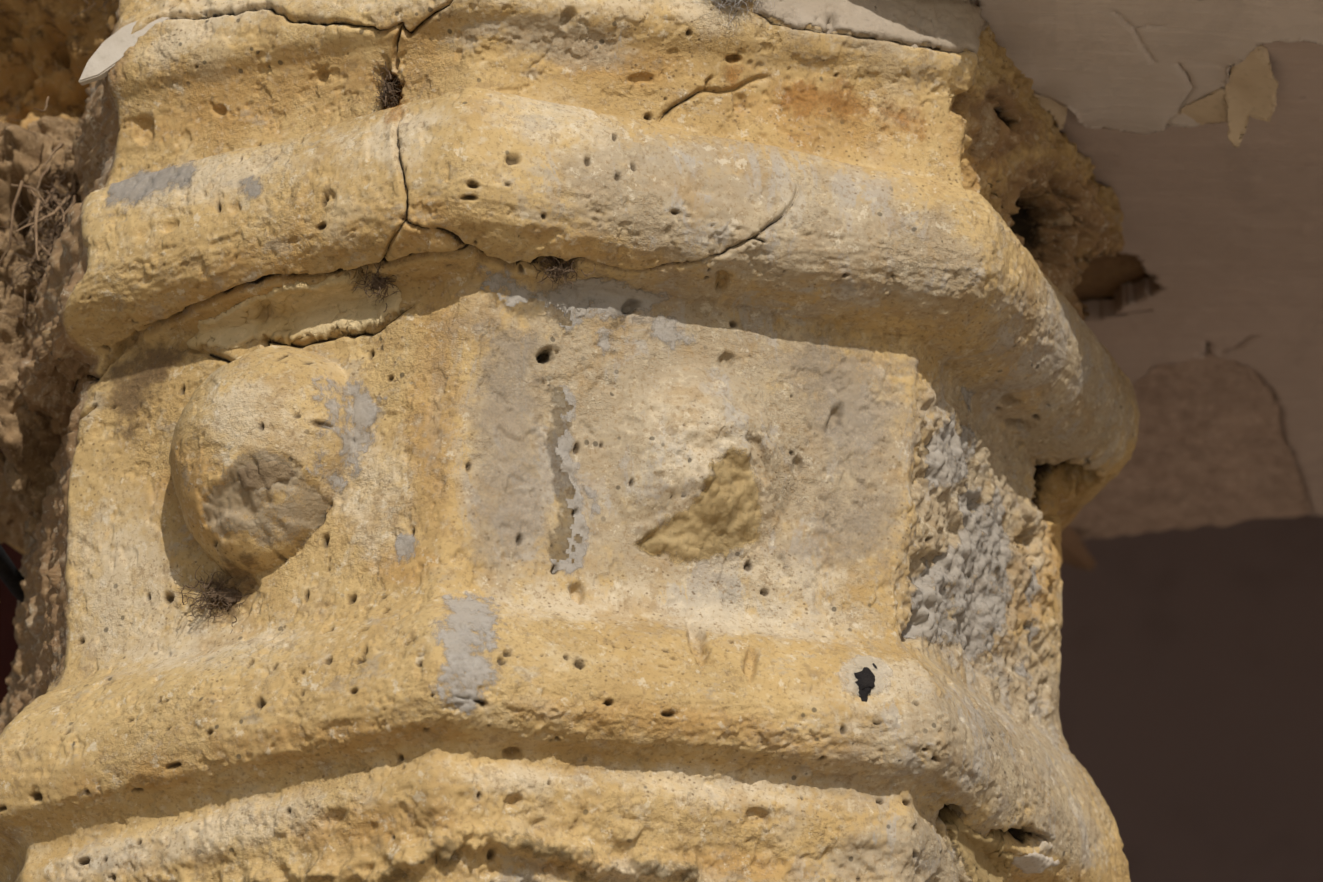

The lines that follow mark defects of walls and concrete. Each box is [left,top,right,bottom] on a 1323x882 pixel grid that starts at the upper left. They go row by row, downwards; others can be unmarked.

peeling [79,17,170,85]
crack [170,5,450,43]
crack [757,13,974,52]
peeling [978,0,1323,148]
crack [379,139,484,263]
hole [1010,199,1041,259]
crack [516,256,581,265]
crack [223,273,297,293]
crack [268,307,412,348]